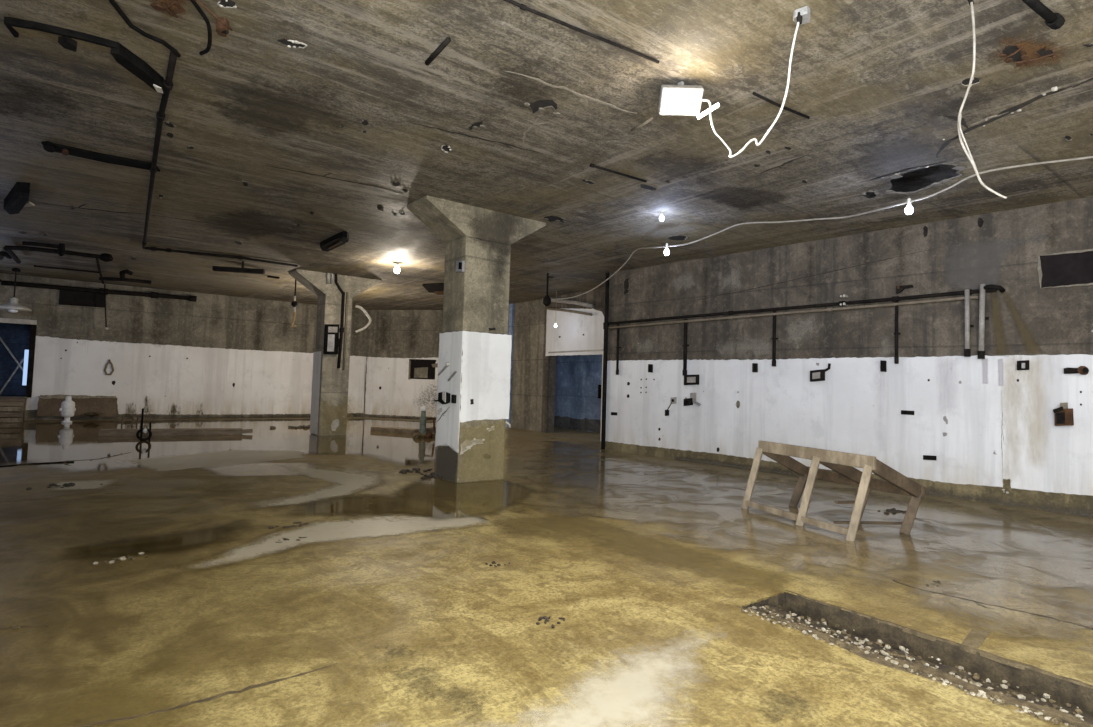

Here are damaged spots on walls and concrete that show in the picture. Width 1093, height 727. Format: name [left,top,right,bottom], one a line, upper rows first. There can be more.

crack [68,663,337,727]